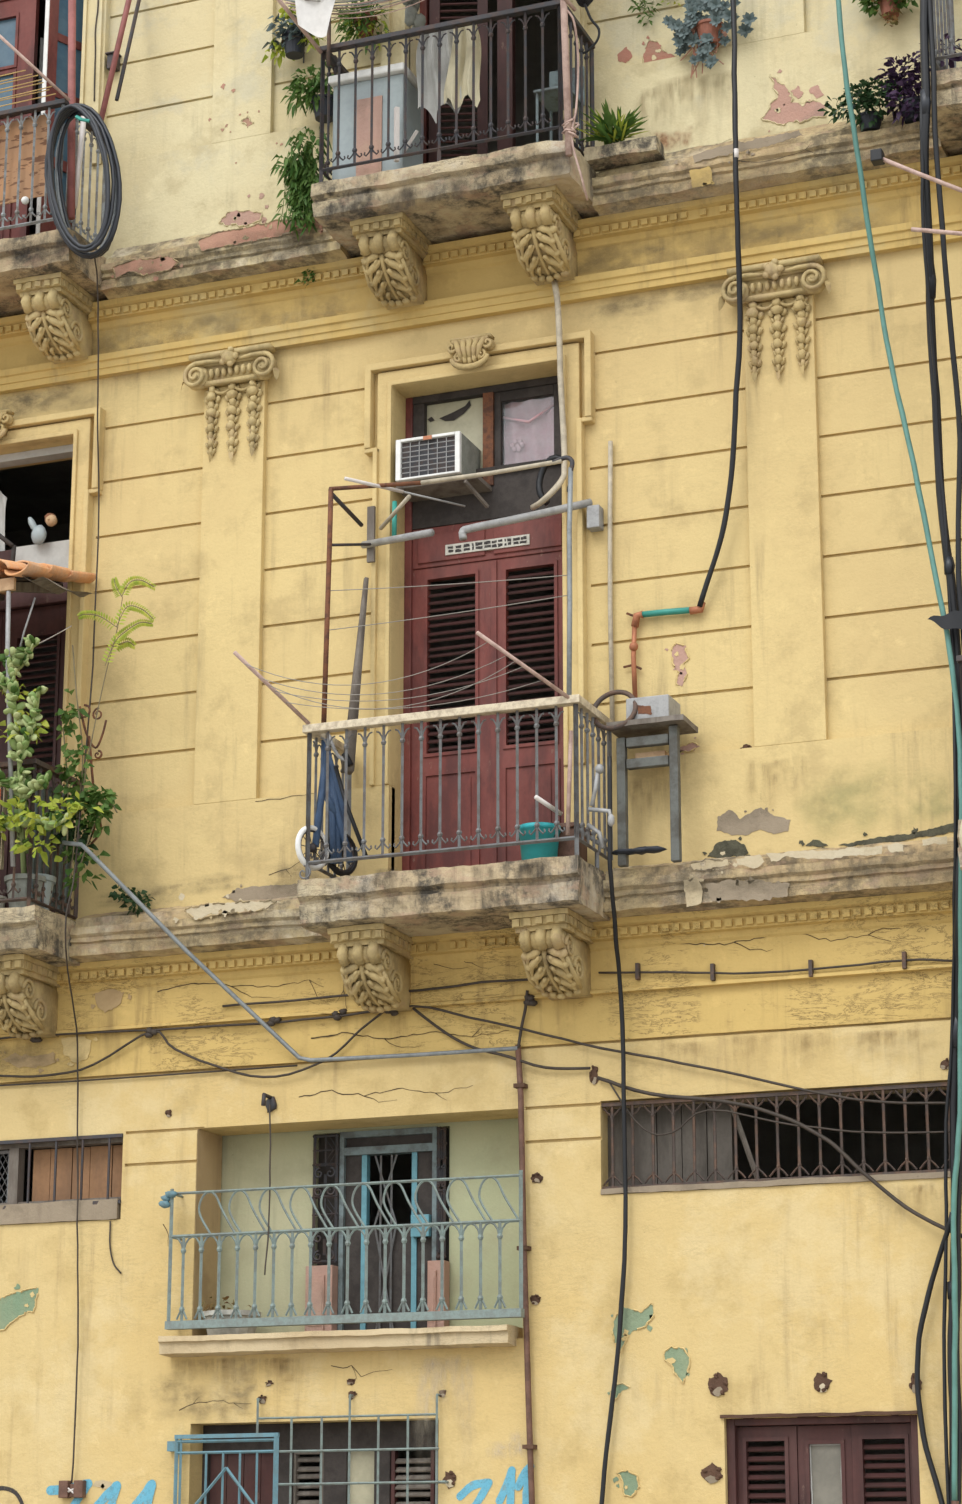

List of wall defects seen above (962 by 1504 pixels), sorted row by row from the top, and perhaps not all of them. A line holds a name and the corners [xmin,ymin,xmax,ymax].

peeling [617,36,677,63]
peeling [674,69,827,188]
peeling [198,193,323,252]
peeling [664,643,690,686]
peeling [683,807,904,907]
peeling [922,836,947,846]
crack [157,980,508,1048]
crack [299,1085,473,1102]
peeling [0,1284,39,1331]
peeling [611,1302,655,1354]
peeling [663,1345,690,1385]
spalling [708,1372,728,1396]